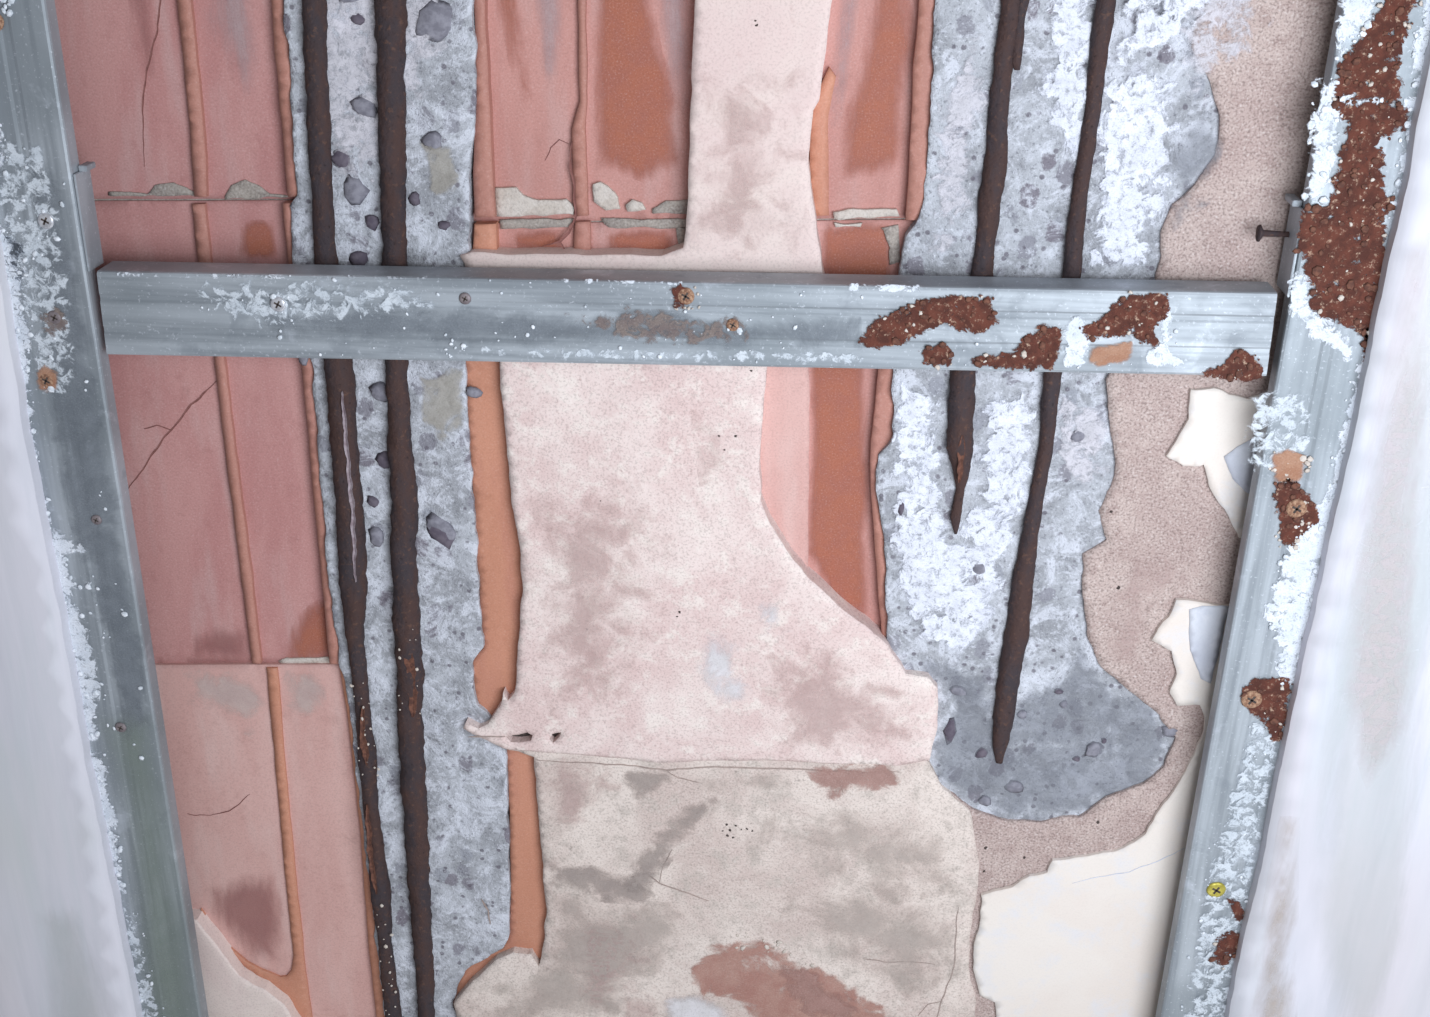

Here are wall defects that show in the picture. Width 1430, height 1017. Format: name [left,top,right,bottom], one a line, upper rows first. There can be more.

crack [142,0,161,167]
spalling [225,0,315,264]
water stain [600,0,673,175]
rust [970,0,1030,277]
rust [1062,0,1116,278]
water stain [1037,0,1251,272]
rust [1292,0,1423,361]
crack [129,381,216,488]
peeling [298,0,1338,1017]
rust [858,290,1170,764]
crack [187,794,250,816]
rust [323,358,435,1017]